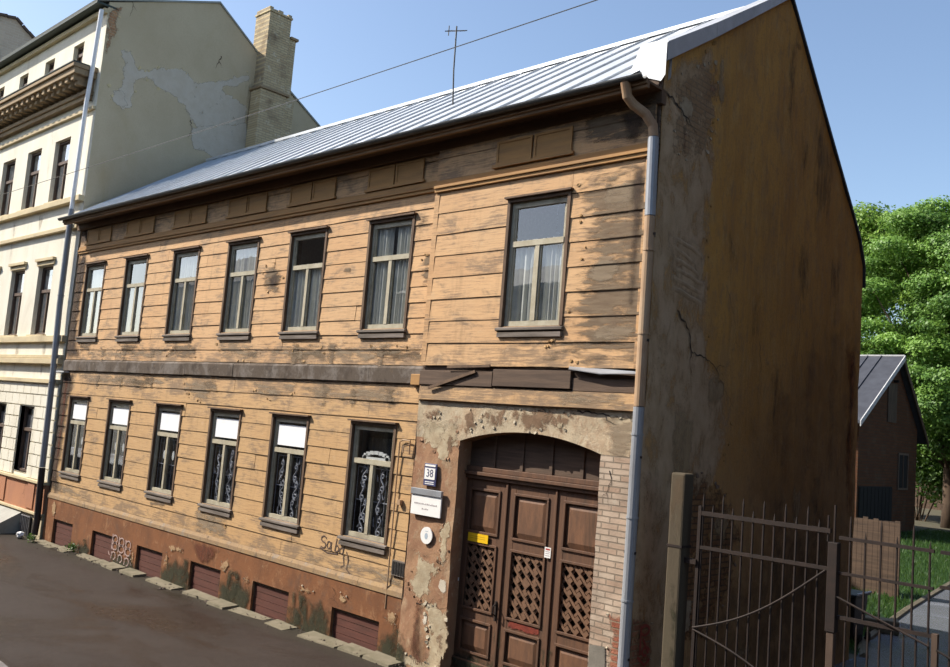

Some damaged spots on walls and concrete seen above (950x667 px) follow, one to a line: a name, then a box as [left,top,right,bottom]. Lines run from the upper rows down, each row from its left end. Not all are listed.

spalling [106,7,122,53]
flaking render [107,50,249,157]
flaking render [419,41,741,667]
crack [677,310,734,409]
spalling [332,522,450,667]